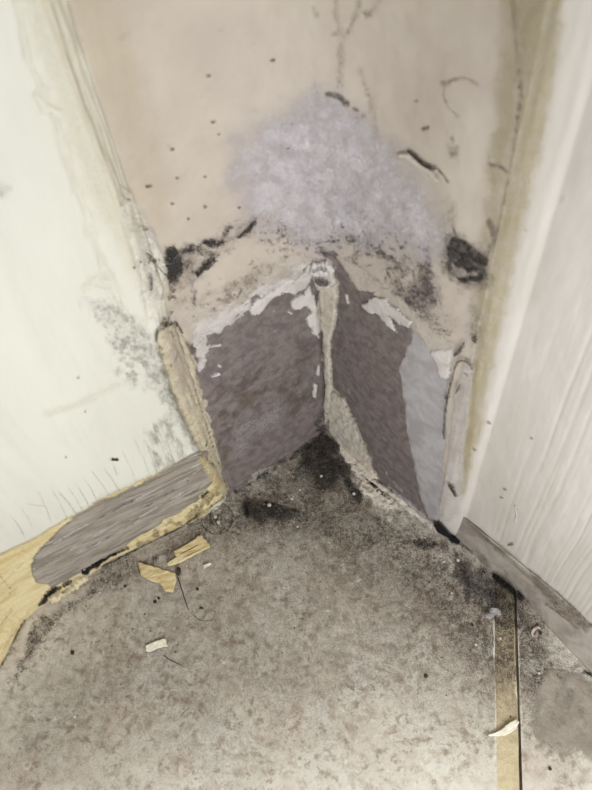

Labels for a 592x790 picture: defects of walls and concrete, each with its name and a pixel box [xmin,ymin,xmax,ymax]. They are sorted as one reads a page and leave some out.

water stain [23,0,567,487]
peeling [153,247,483,533]